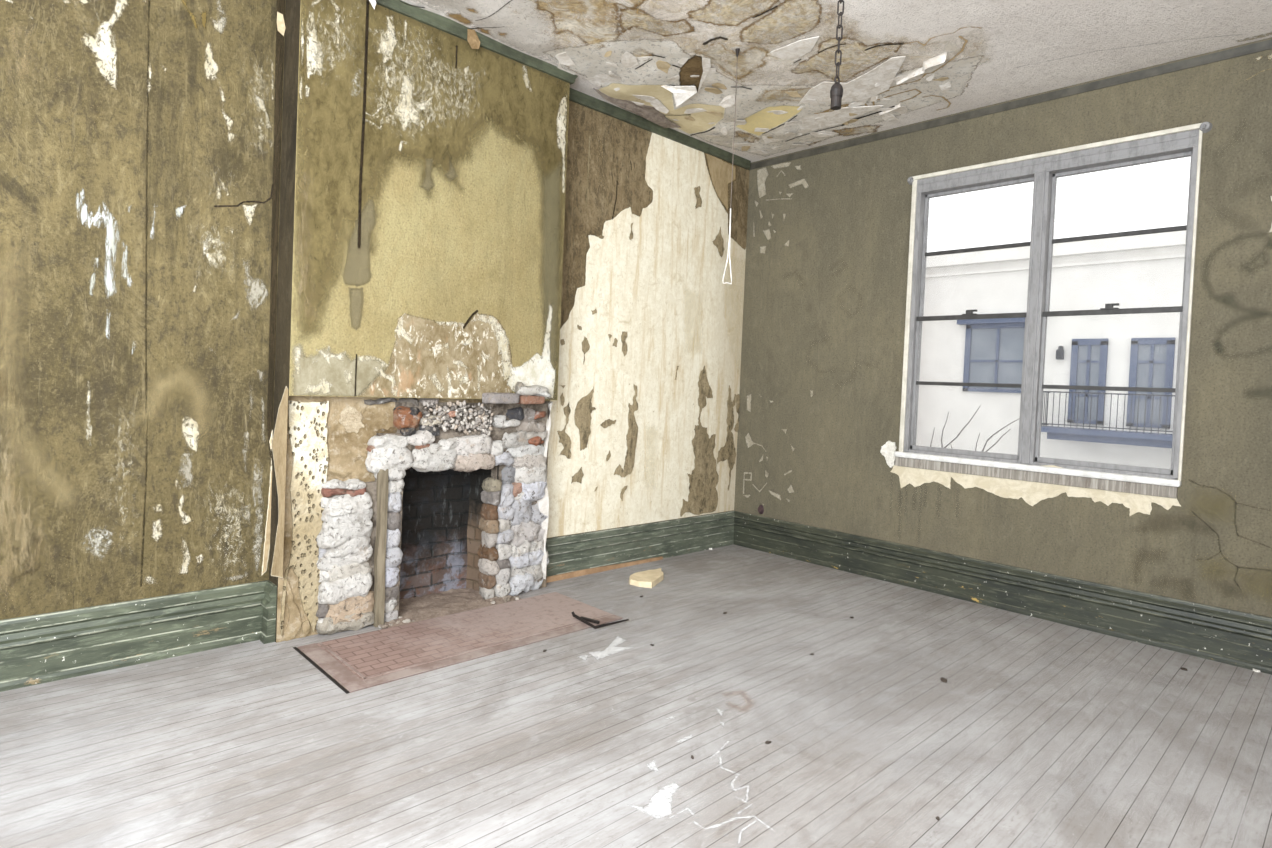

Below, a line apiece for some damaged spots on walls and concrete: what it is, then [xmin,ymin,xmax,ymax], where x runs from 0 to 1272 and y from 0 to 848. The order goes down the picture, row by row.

peeling [81,0,129,89]
peeling [369,0,409,68]
crack [214,184,274,207]
damp [292,0,569,400]
flaking render [417,0,983,538]
spalling [339,313,513,434]
spalling [880,441,1181,516]